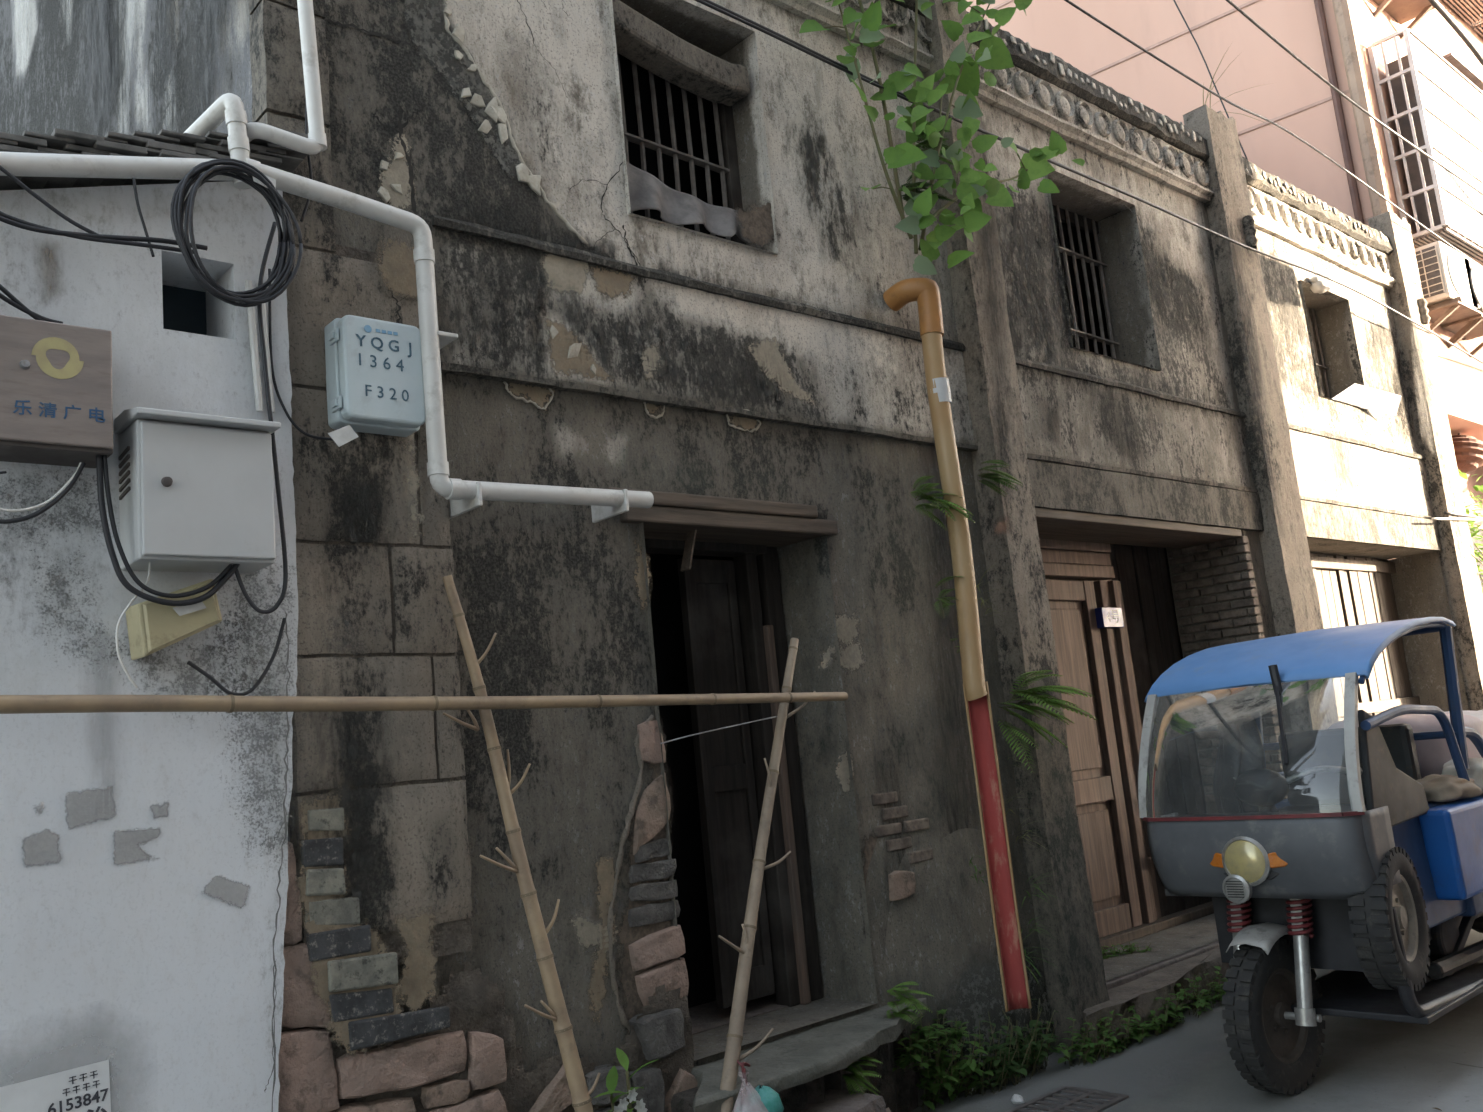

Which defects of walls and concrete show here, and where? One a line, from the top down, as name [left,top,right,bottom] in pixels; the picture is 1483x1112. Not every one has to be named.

crack [517,0,573,94]
flaking render [376,133,417,210]
flaking render [376,238,417,300]
flaking render [404,0,636,300]
leakage [735,199,781,248]
leakage [563,295,782,409]
flaking render [748,337,817,405]
leakage [983,199,1228,487]
leakage [1224,226,1324,522]
leakage [0,469,297,861]
peeling [22,786,169,867]
spalling [296,783,450,1056]